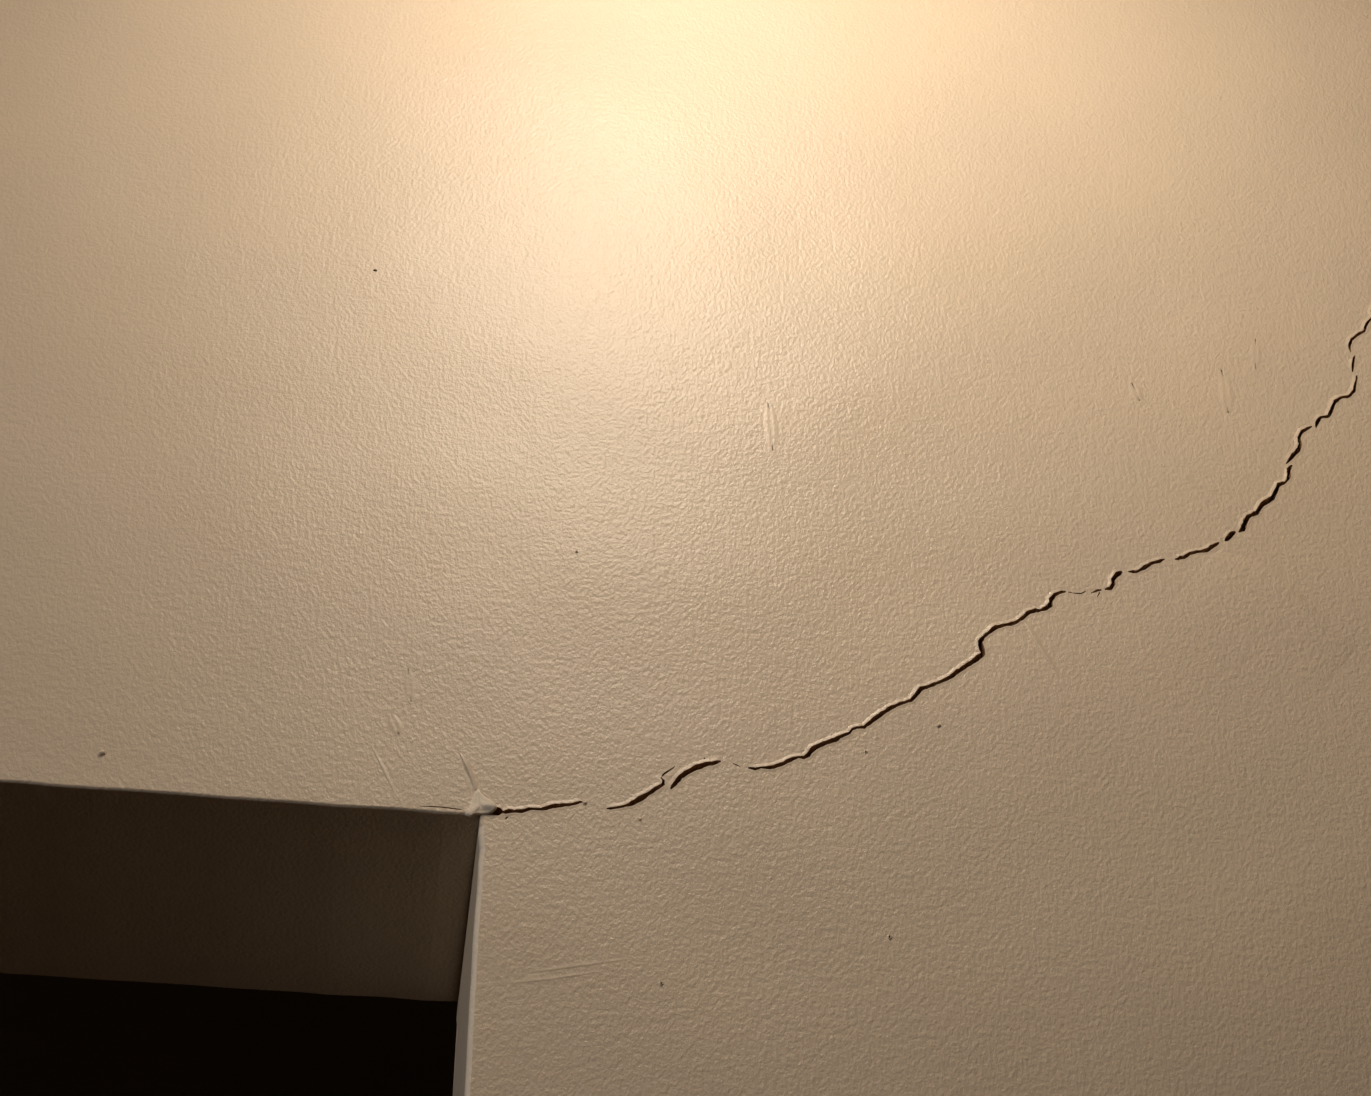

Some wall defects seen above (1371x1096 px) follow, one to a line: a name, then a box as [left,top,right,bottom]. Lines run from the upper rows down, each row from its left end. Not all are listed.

crack [421,303,1371,819]